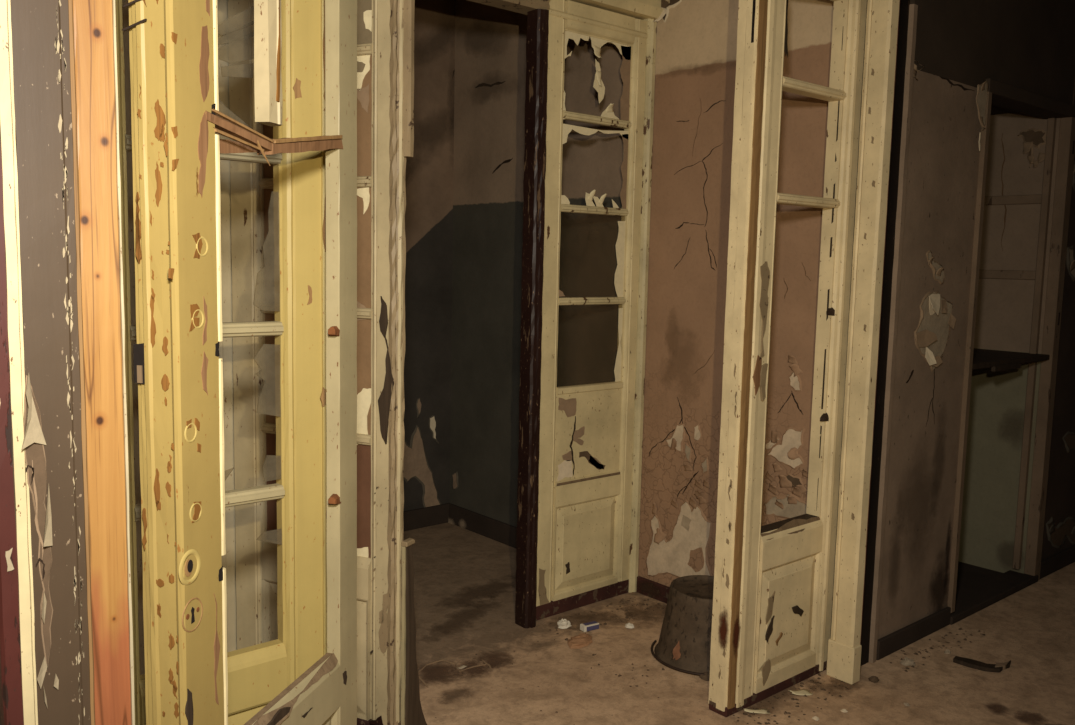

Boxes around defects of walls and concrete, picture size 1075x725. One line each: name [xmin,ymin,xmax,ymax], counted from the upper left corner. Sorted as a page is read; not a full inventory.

crack [674,100,726,271]
peeling [914,250,956,371]
flaking render [403,398,441,507]
crack [649,397,698,497]
flaking render [646,423,712,577]
peeling [764,427,808,519]
crack [778,391,803,414]